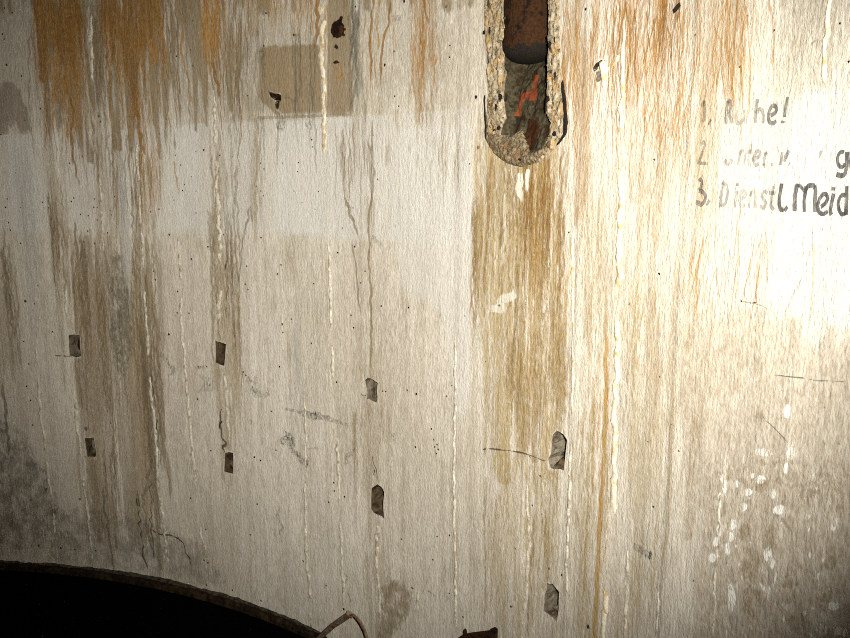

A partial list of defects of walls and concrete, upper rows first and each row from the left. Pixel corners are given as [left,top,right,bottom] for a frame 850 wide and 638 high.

corrosion [32,0,93,181]
corrosion [99,0,168,226]
corrosion [200,0,230,96]
spalling [483,0,506,138]
corrosion [525,118,539,151]
spalling [535,0,564,164]
corrosion [562,0,706,176]
corrosion [703,0,757,107]
corrosion [518,158,553,347]
water stain [681,310,850,518]
crack [136,498,190,565]